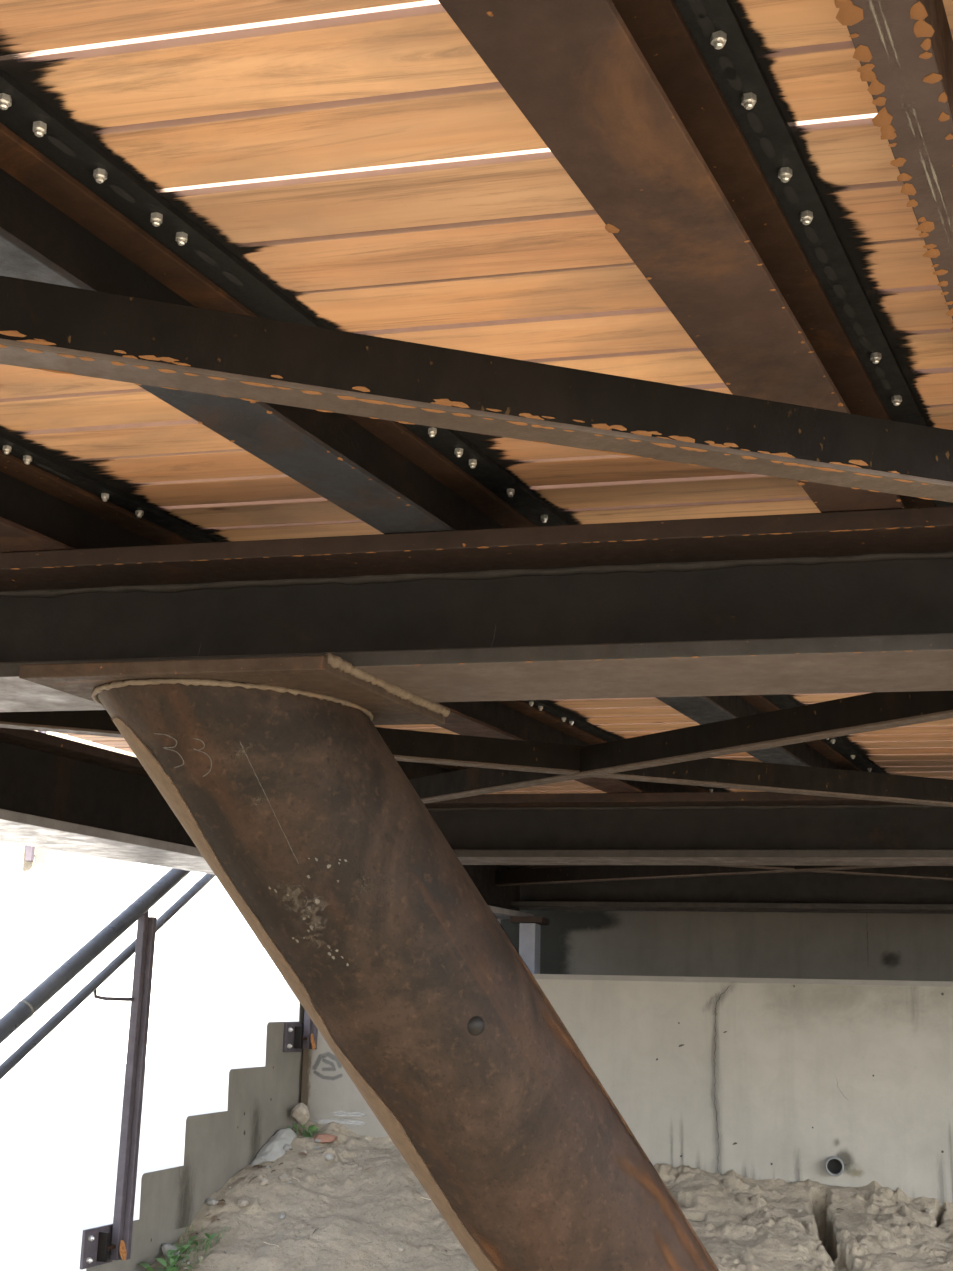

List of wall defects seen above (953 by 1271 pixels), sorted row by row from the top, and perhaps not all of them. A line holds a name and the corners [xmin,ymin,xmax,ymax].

rust [834,0,953,331]
rust [0,331,94,374]
rust [111,350,332,414]
rust [337,386,935,500]
rust [111,716,500,1271]
rust [490,909,719,1271]